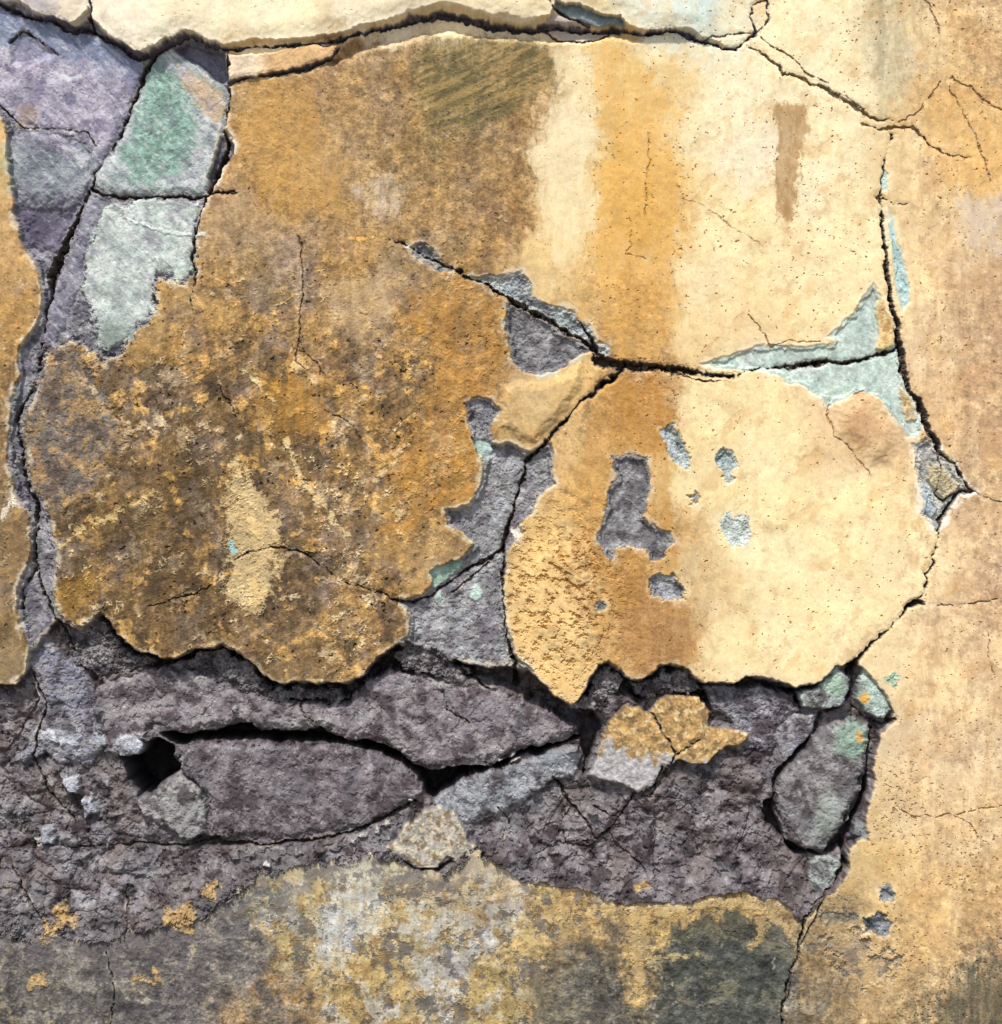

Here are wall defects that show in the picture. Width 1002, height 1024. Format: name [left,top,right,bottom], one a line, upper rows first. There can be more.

spalling [0,0,41,17]
spalling [0,8,230,653]
crack [0,0,1002,689]
peeling [699,170,972,532]
spalling [402,395,557,600]
spalling [596,453,687,604]
peeling [658,422,693,472]
peeling [686,490,703,507]
peeling [718,510,753,549]
spalling [0,555,898,949]
crack [780,865,848,1024]